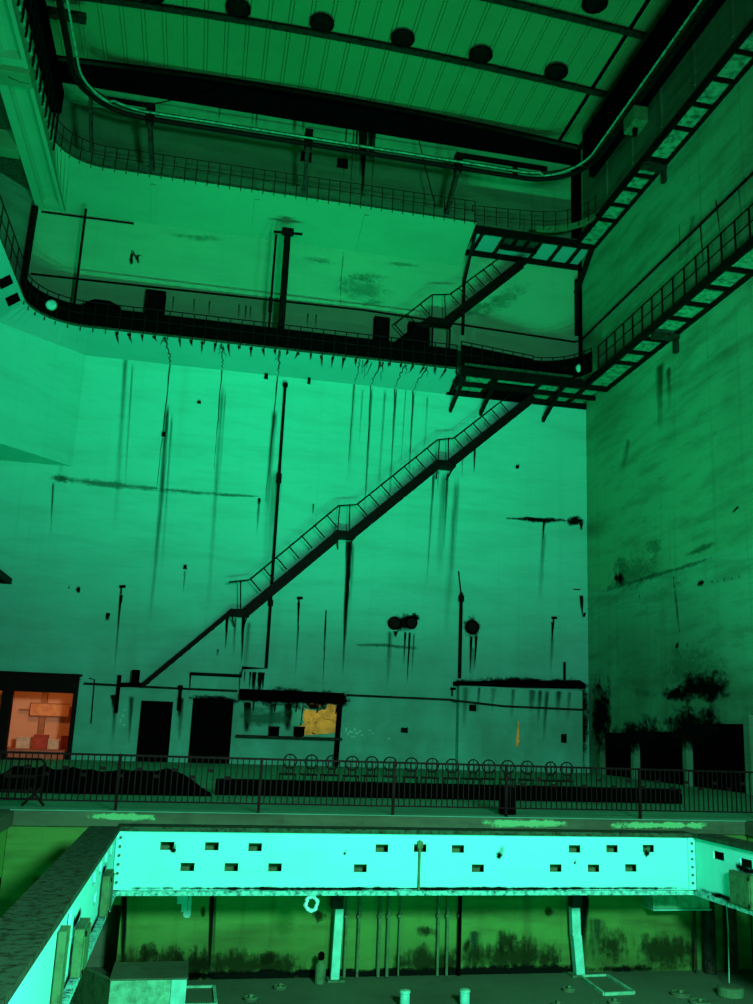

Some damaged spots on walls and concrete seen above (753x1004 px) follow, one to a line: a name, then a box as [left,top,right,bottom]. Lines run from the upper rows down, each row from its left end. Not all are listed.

damp [55,410,252,522]
damp [507,516,583,535]